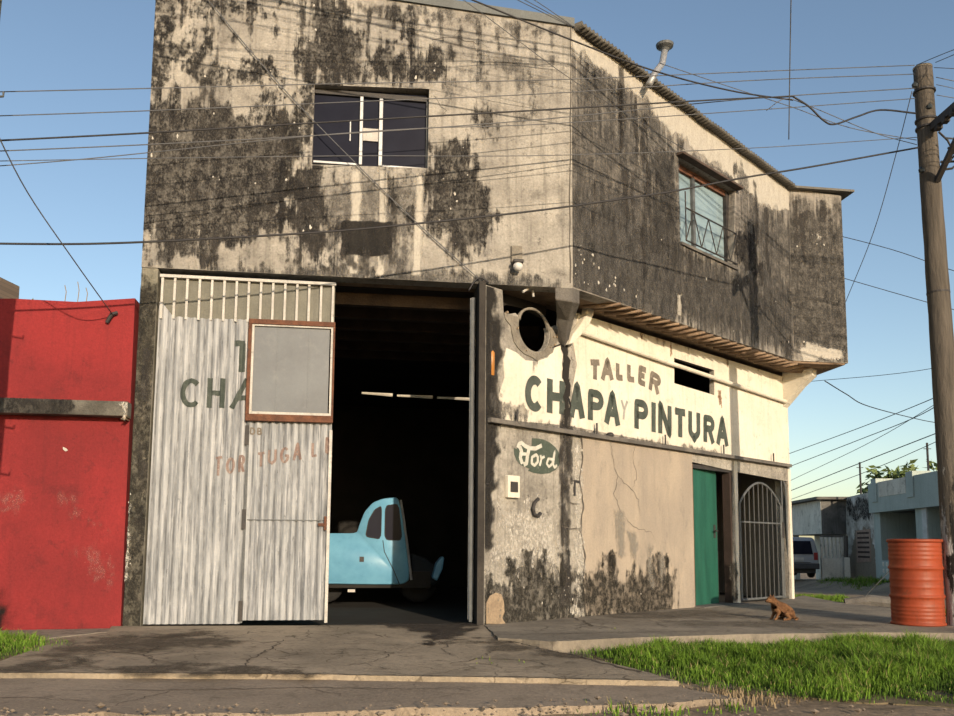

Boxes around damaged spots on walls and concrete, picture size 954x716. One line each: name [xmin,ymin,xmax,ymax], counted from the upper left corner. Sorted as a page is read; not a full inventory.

leakage [495,21,559,123]
leakage [142,0,502,280]
leakage [612,66,651,213]
leakage [734,180,773,298]
leakage [490,400,515,466]
peeling [490,496,560,580]
peeling [570,442,585,617]
leakage [485,414,679,625]
crack [8,646,211,703]
crack [227,632,666,696]